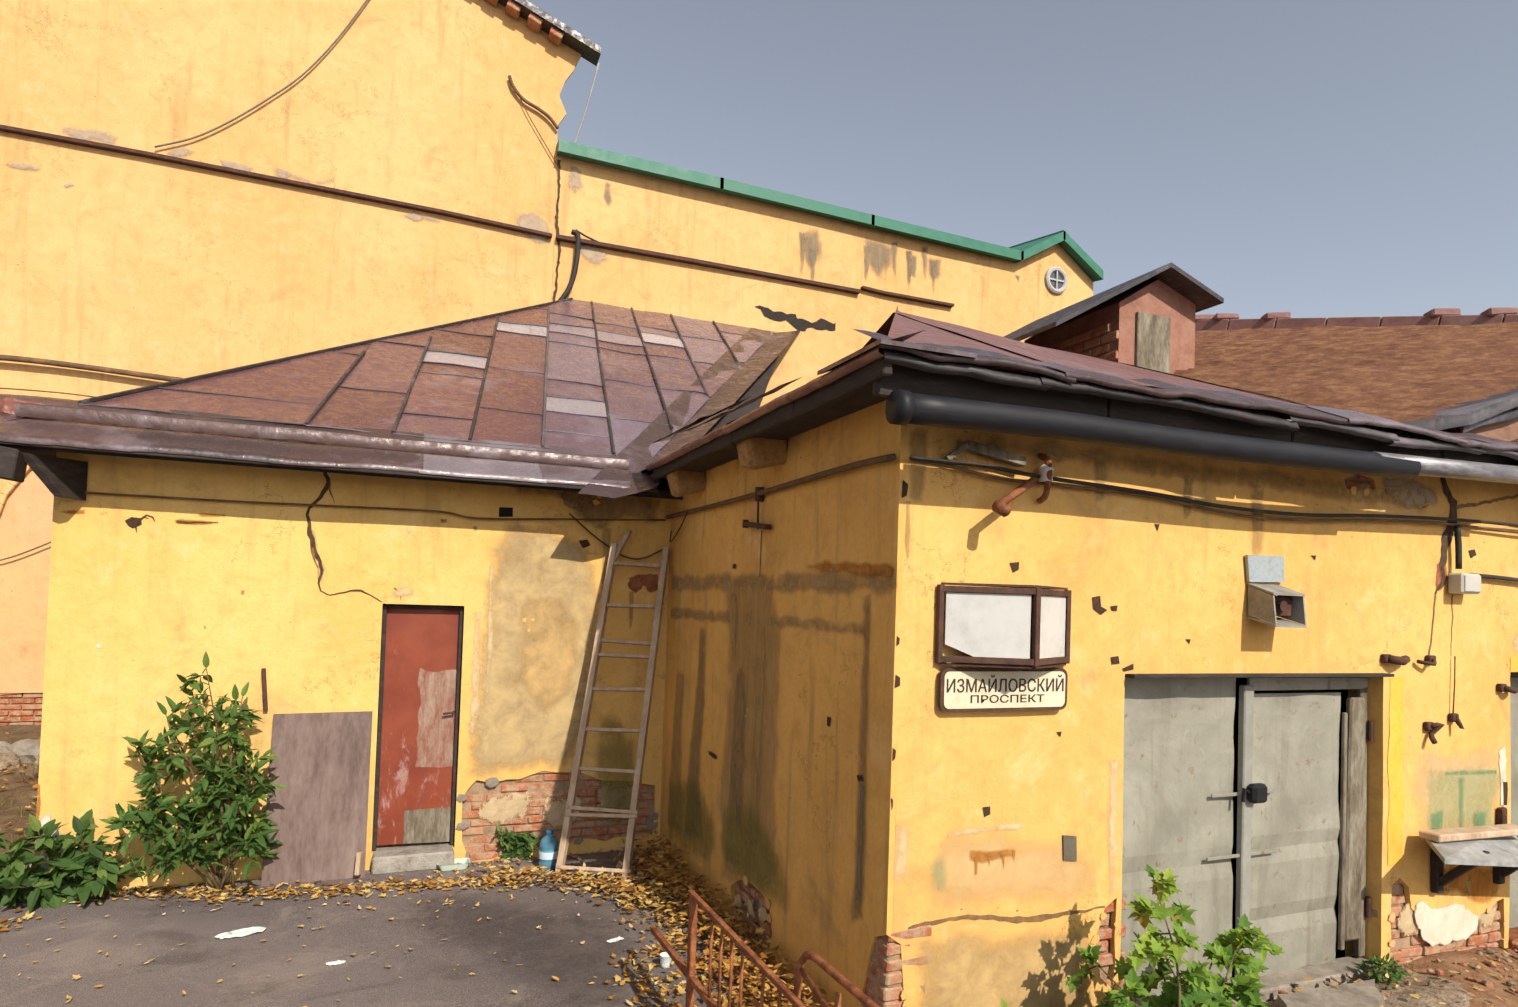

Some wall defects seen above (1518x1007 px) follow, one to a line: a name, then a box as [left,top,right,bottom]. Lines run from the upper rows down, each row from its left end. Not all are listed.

leakage [800,233,819,277]
leakage [865,241,939,279]
leakage [906,432,925,554]
spalling [0,693,43,726]
peeling [456,529,659,861]
leakage [668,561,893,917]
peeling [37,785,64,869]
rust [971,850,1015,874]
spalling [1372,879,1507,965]